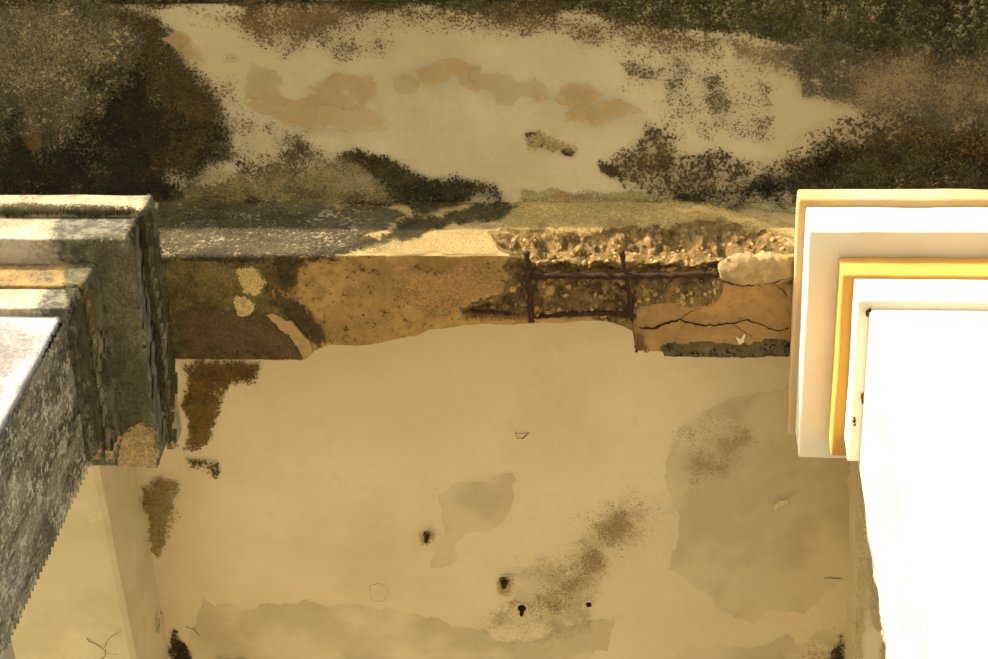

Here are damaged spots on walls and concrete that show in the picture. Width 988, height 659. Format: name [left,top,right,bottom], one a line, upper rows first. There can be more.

peeling [417,60,479,91]
peeling [247,72,373,132]
peeling [560,84,642,125]
spalling [525,130,578,156]
damp [0,0,988,349]
peeling [233,265,267,317]
spalling [459,221,795,353]
peeling [266,313,312,360]
crack [639,308,788,336]
damp [181,359,260,480]
damp [139,475,181,557]
damp [830,635,846,659]